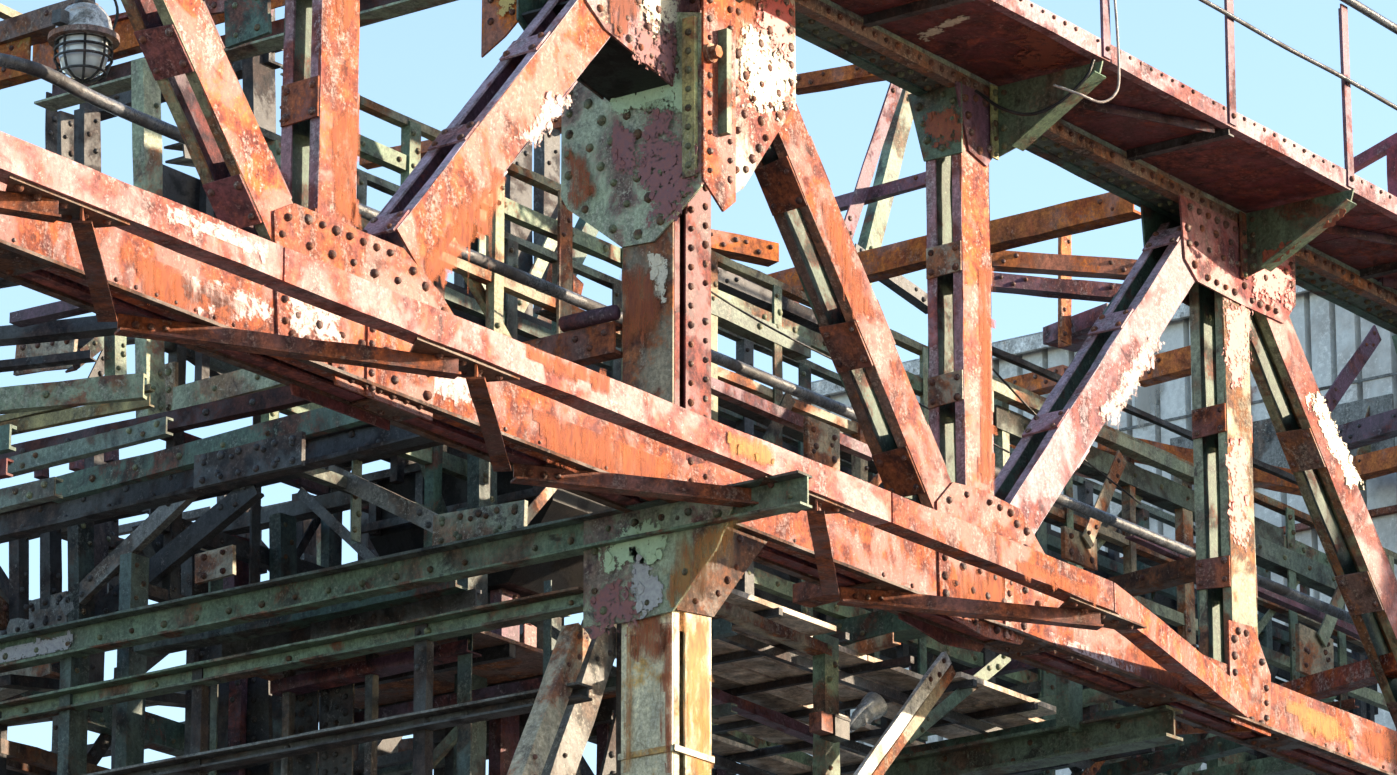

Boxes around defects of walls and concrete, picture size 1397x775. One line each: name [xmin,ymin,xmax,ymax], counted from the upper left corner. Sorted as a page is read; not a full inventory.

peeling [608,0,706,228]
peeling [736,0,797,131]
rust [526,344,610,393]
rust [533,408,677,478]
rust [978,269,997,488]
peeling [1305,391,1365,490]
peeling [584,518,671,642]
rust [623,514,734,775]
rust [952,570,1020,604]
rust [1017,561,1096,606]